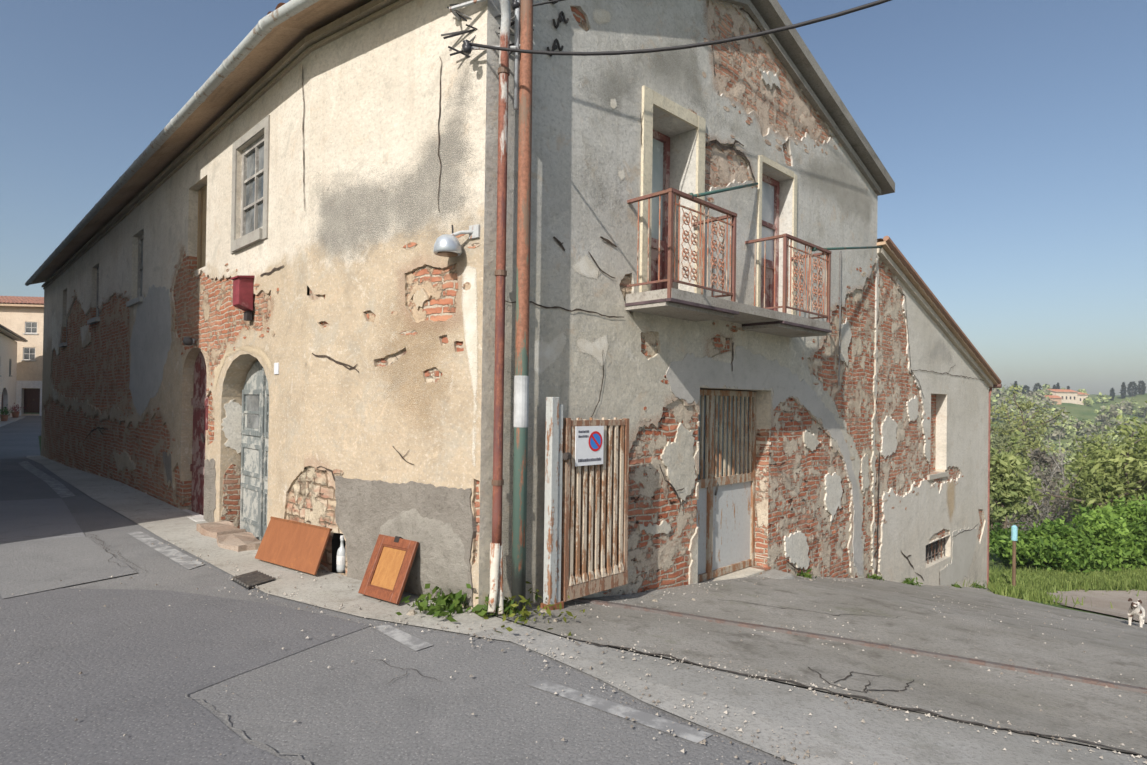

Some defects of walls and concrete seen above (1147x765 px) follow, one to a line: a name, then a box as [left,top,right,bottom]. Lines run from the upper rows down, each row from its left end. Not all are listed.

flaking render [698,0,842,166]
flaking render [705,133,758,203]
flaking render [43,288,192,508]
flaking render [170,244,279,529]
spalling [376,349,407,367]
flaking render [391,234,481,352]
crack [506,301,619,318]
crack [553,236,617,278]
flaking render [749,255,964,578]
spalling [286,454,348,575]
flaking render [603,375,700,597]